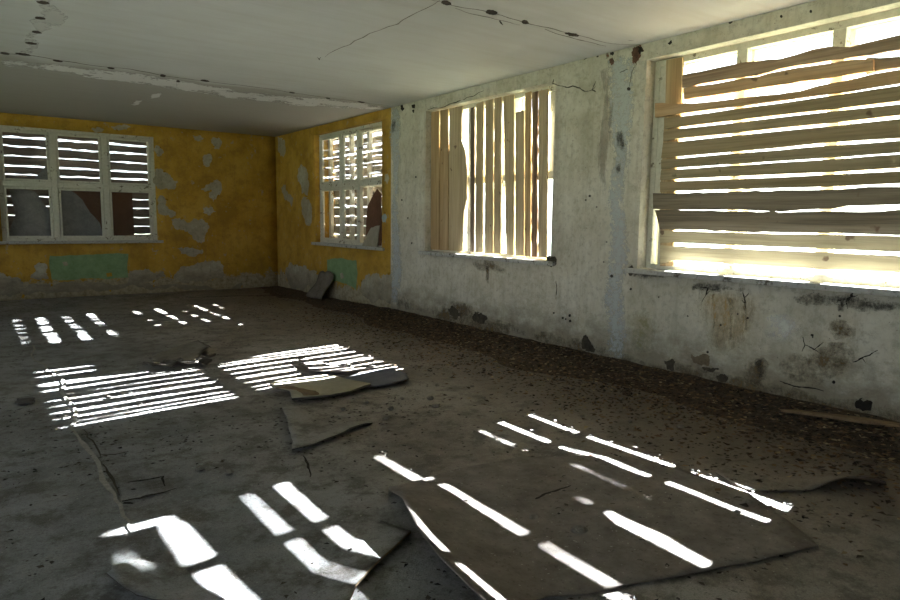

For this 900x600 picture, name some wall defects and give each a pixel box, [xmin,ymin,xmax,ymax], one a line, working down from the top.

flaking render [22,0,67,53]
crack [317,0,637,92]
peeling [128,167,225,283]
peeling [281,164,312,226]
damp [790,293,900,381]